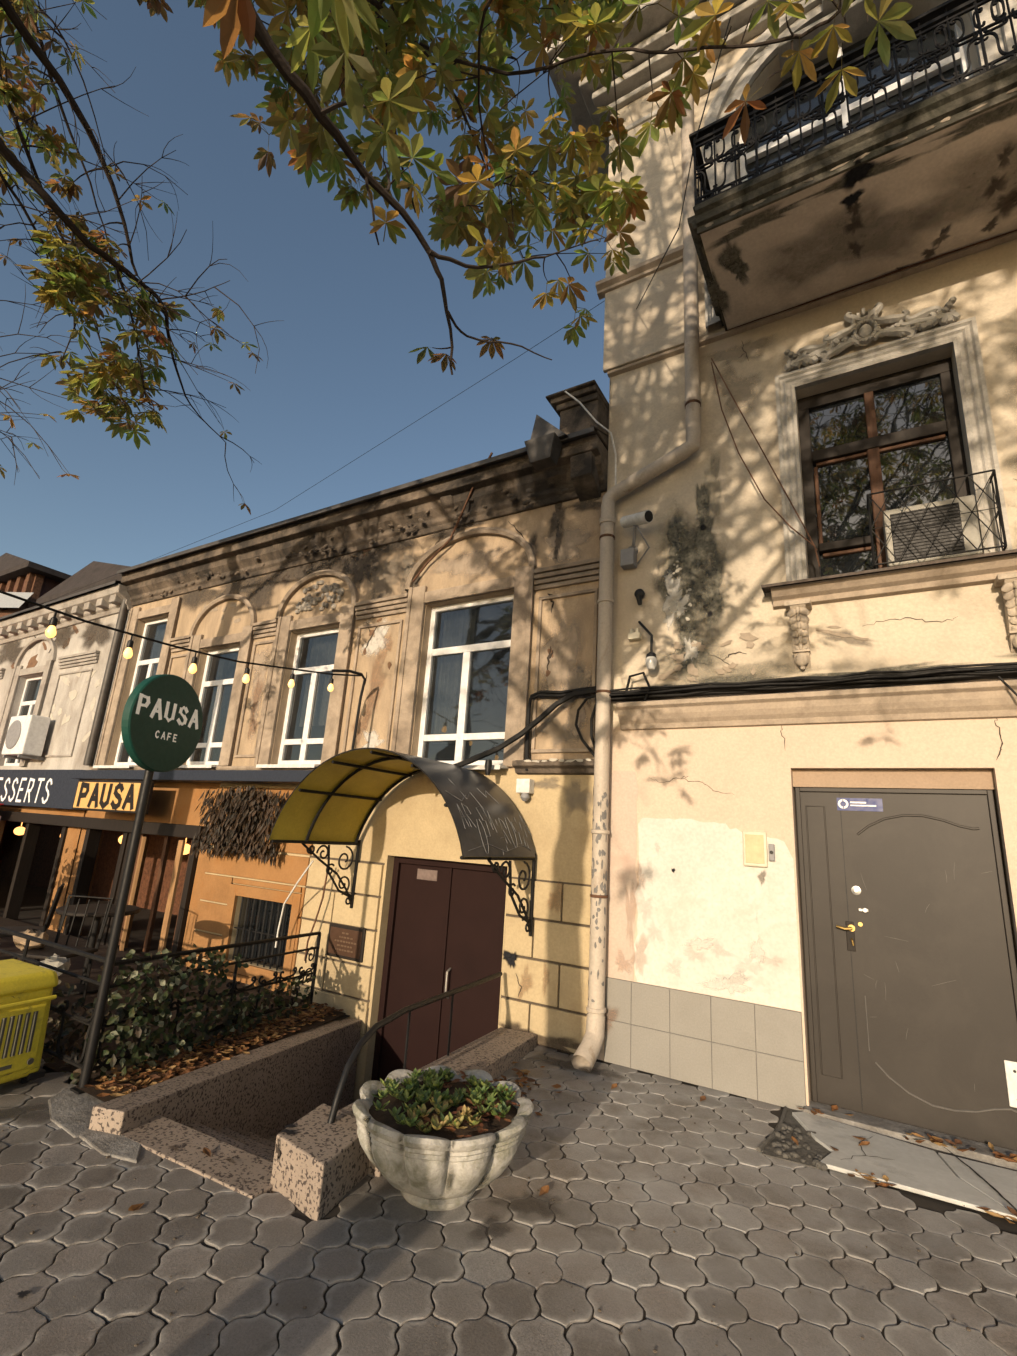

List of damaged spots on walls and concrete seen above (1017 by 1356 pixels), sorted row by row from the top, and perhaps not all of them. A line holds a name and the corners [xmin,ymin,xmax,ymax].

damp [941,100,1017,141]
damp [807,157,913,255]
damp [938,143,1017,231]
damp [706,204,793,312]
peeling [663,554,692,623]
peeling [658,632,758,681]
peeling [816,626,869,641]
crack [864,616,958,626]
crack [942,1146,1017,1212]